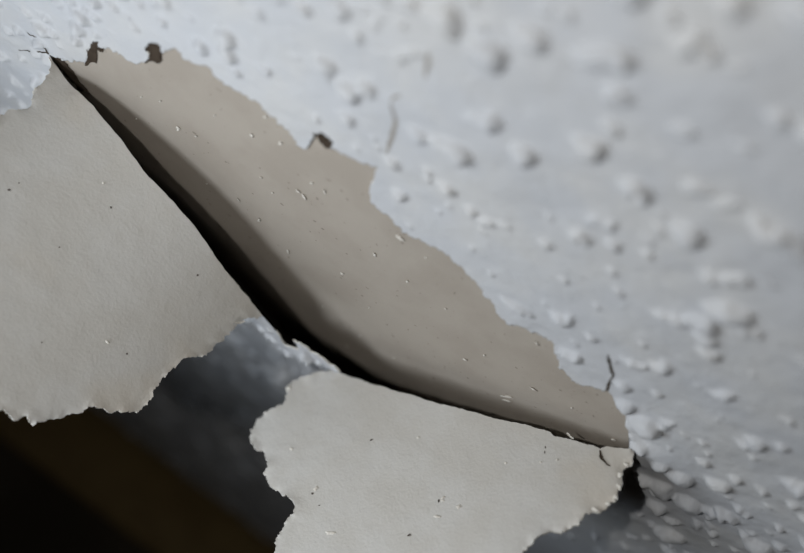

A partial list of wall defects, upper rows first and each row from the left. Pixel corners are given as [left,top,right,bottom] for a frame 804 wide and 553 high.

peeling [0,41,635,553]